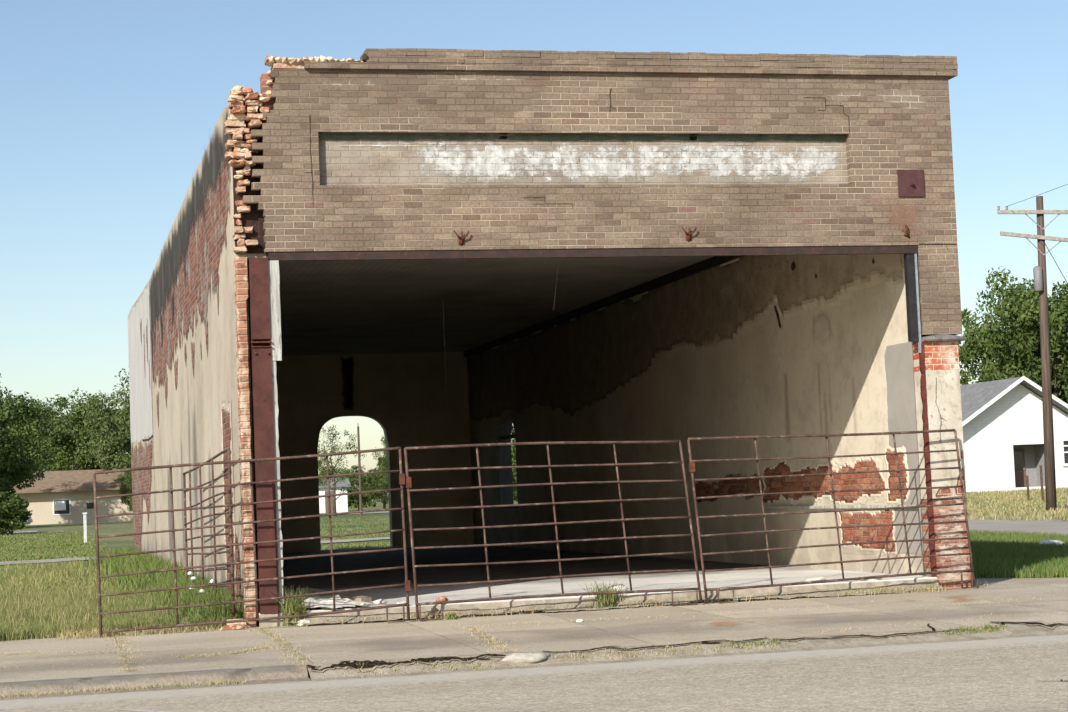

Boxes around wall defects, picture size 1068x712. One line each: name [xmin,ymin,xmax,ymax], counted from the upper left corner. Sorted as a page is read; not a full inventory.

crack [804,97,850,133]
peeling [140,54,369,425]
flaking render [467,254,906,433]
flaking render [131,440,152,551]
flaking render [695,444,910,560]
peeling [935,450,969,583]
crack [305,653,506,673]
crack [542,624,964,653]
crack [993,621,1068,630]